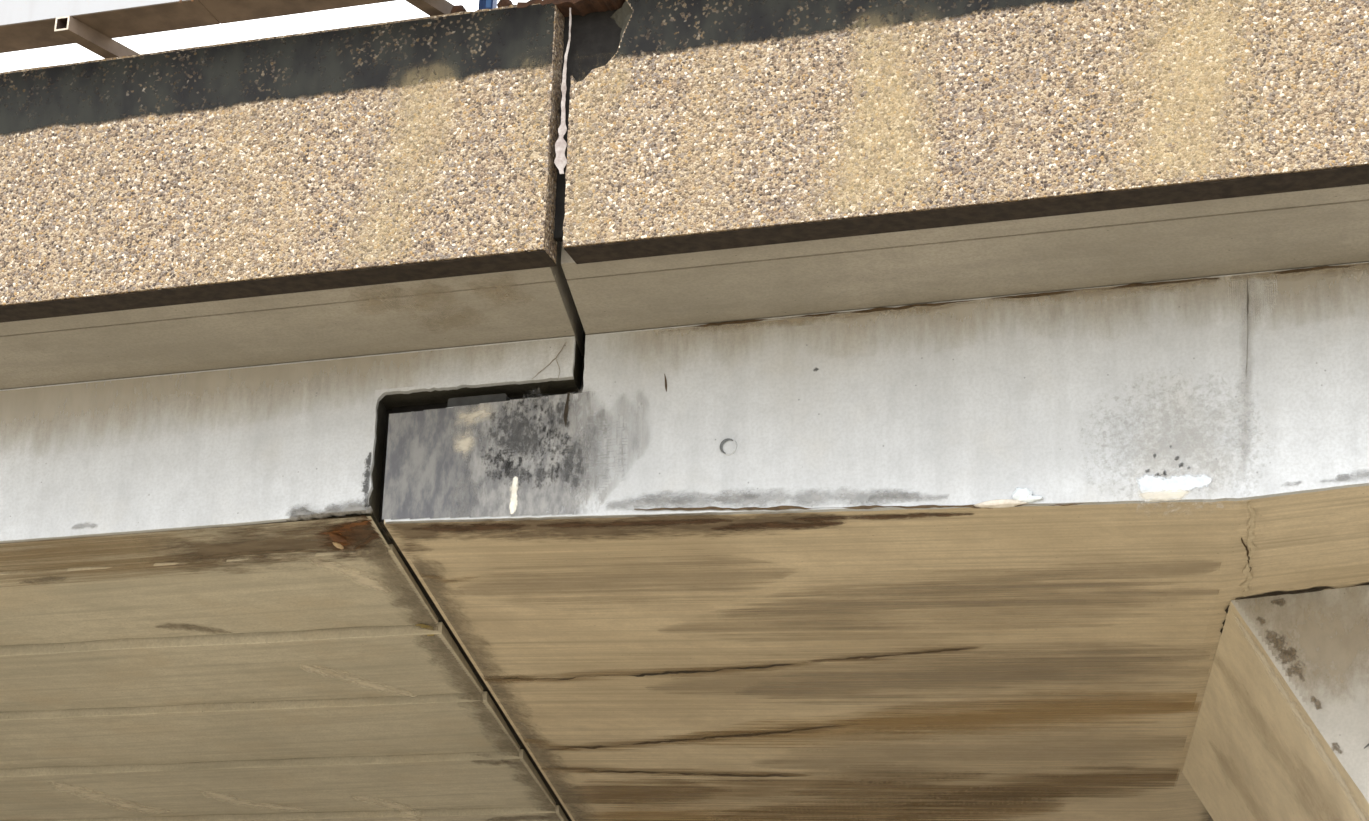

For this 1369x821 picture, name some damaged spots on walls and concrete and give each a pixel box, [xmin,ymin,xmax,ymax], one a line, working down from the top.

spalling [611,1,633,53]
corrosion [317,515,382,559]
leakage [0,390,1043,575]
crack [1220,501,1369,634]